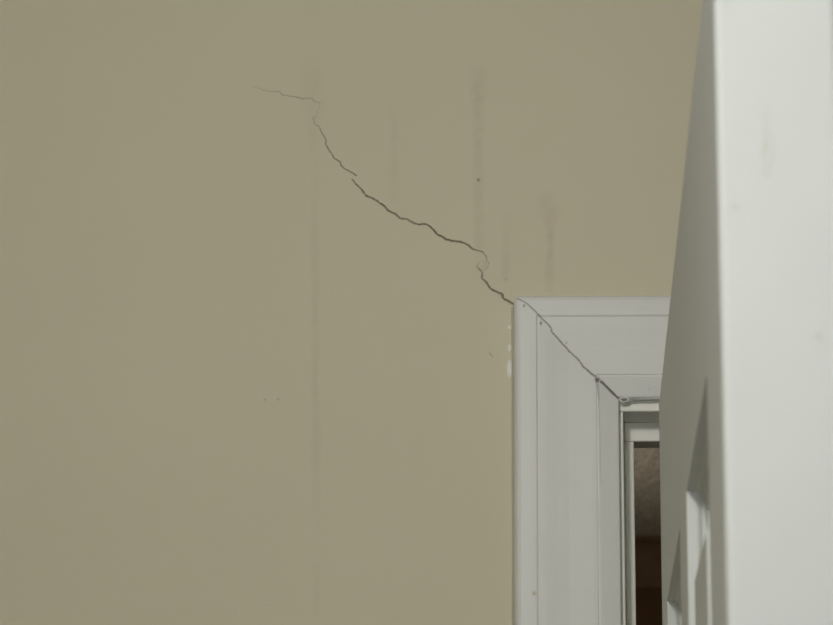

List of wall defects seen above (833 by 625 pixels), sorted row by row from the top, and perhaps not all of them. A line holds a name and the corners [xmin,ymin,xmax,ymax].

crack [251,86,660,489]